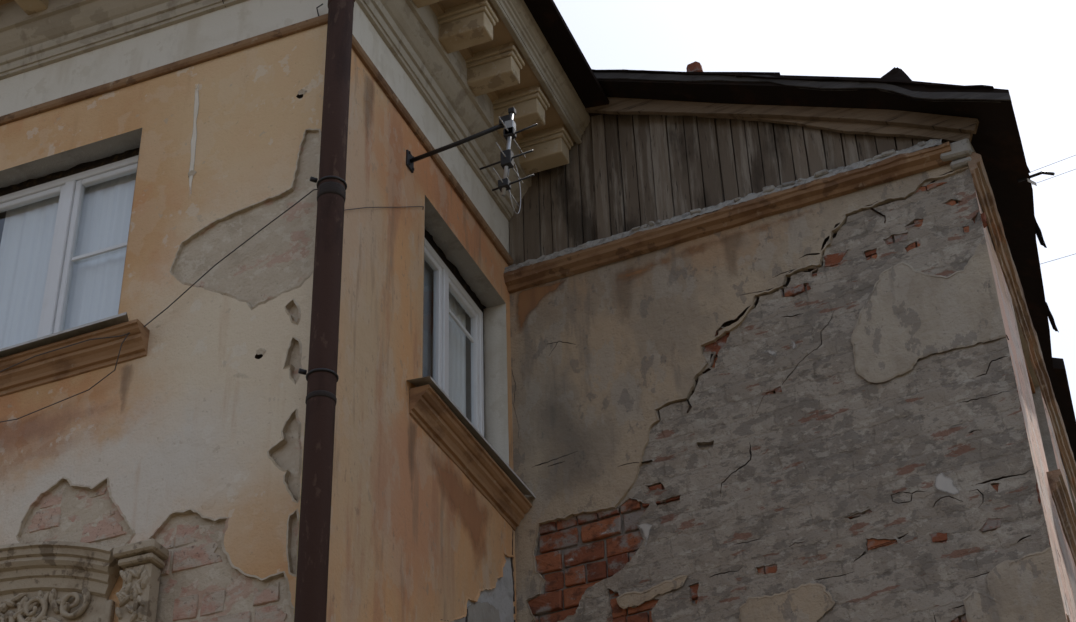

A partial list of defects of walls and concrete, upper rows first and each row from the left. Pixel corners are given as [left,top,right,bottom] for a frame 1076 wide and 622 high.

spalling [170,128,321,384]
spalling [439,166,1053,622]
crack [686,226,837,413]
flaking render [16,477,136,548]
flaking render [148,409,303,622]